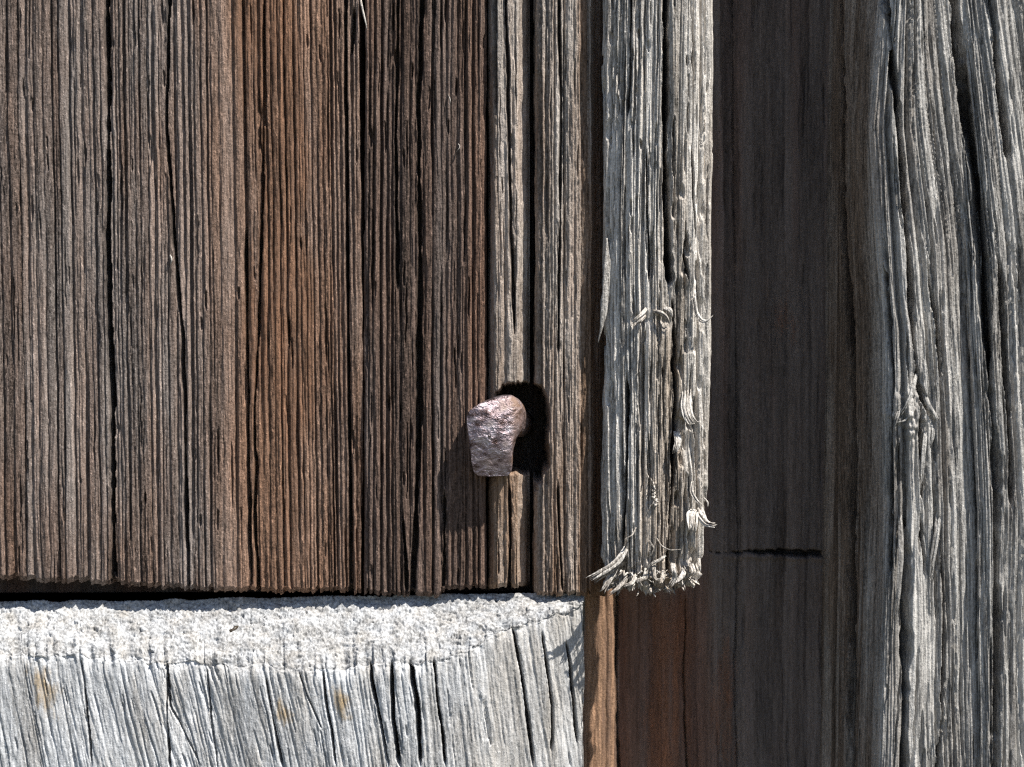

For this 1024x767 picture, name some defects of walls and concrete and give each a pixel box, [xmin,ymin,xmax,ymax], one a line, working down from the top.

crack [749,548,821,556]